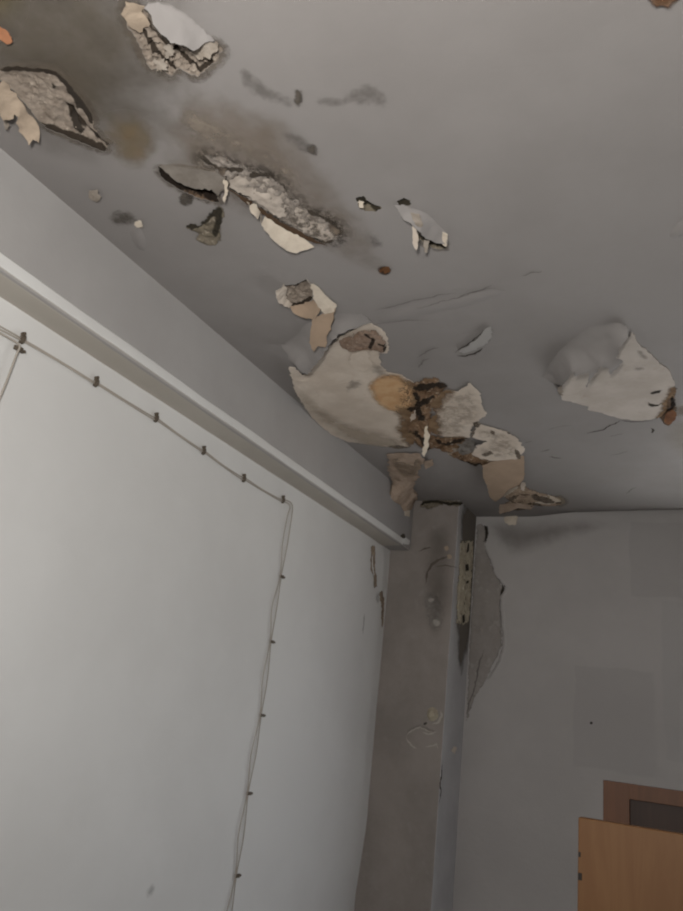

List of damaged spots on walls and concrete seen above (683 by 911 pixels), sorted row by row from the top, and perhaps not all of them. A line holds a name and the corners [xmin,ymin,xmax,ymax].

spalling [120,0,225,80]
spalling [0,63,112,152]
spalling [156,150,344,253]
flaking render [356,196,381,212]
peeling [394,198,449,253]
peeling [276,280,565,525]
peeling [542,323,677,426]
flaking render [456,524,502,720]